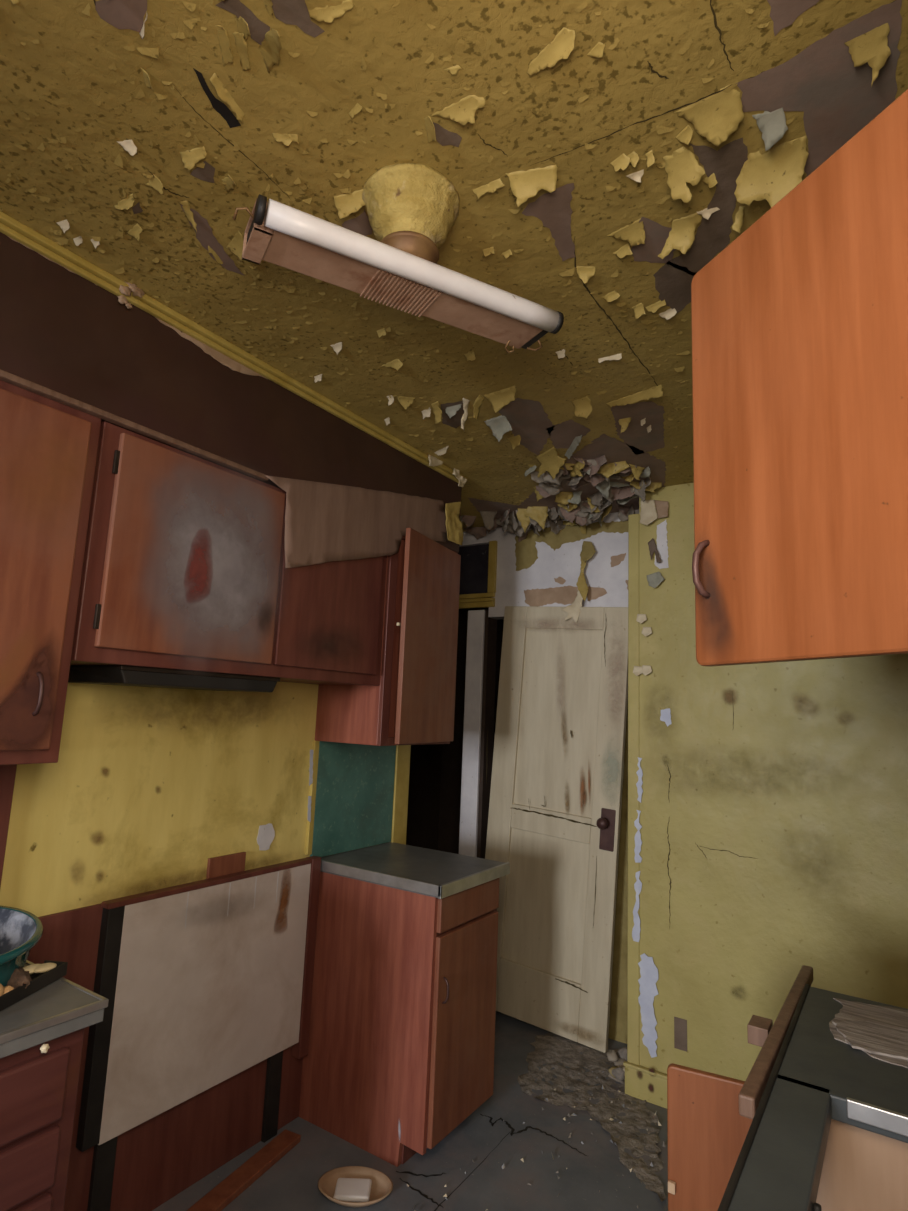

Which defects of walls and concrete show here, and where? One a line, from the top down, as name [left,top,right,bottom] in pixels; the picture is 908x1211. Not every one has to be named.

peeling [193,0,354,128]
peeling [334,189,373,236]
peeling [424,95,486,147]
peeling [473,165,596,284]
peeling [527,27,606,77]
crack [477,0,764,166]
peeling [606,0,902,320]
flaking render [384,384,669,588]
peeling [524,577,607,606]
peeling [632,757,659,1058]
crack [667,765,758,927]
crack [396,1114,587,1211]